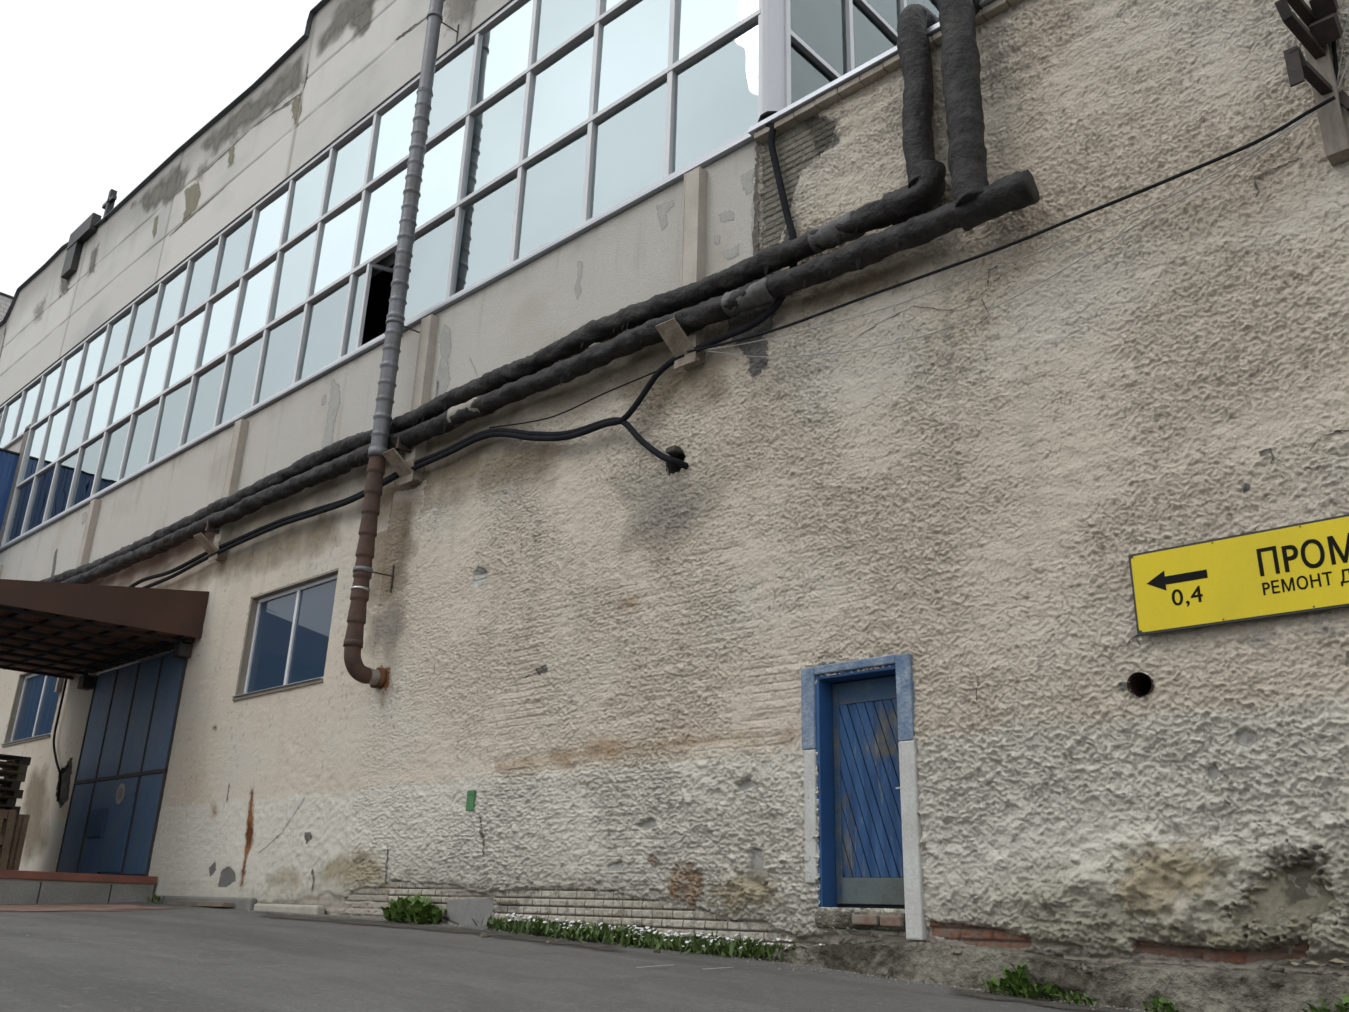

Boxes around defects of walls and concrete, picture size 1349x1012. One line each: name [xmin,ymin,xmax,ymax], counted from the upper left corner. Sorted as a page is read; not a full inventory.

leakage [320,0,373,52]
leakage [204,57,302,166]
leakage [132,166,203,211]
spalling [741,114,840,250]
corrosion [240,789,253,885]
spalling [495,861,794,949]
spalling [1133,855,1341,963]